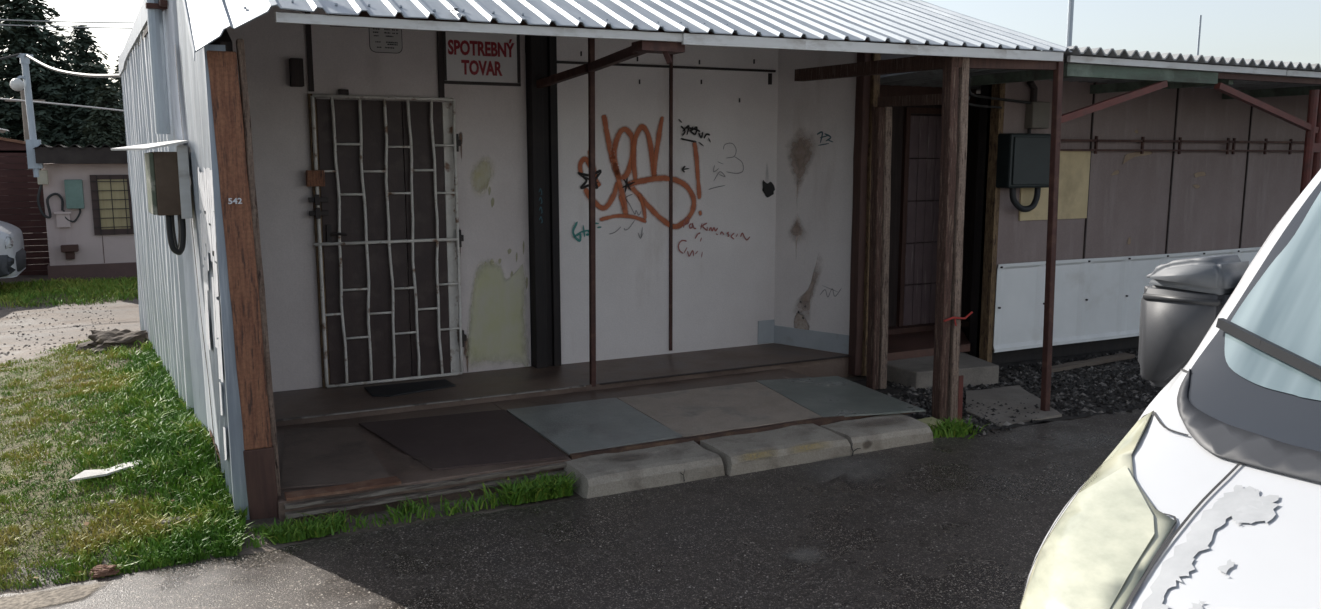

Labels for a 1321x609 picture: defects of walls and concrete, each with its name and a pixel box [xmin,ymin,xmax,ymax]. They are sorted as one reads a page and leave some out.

water stain [790,138,811,198]
peeling [468,241,528,366]
water stain [799,273,817,309]